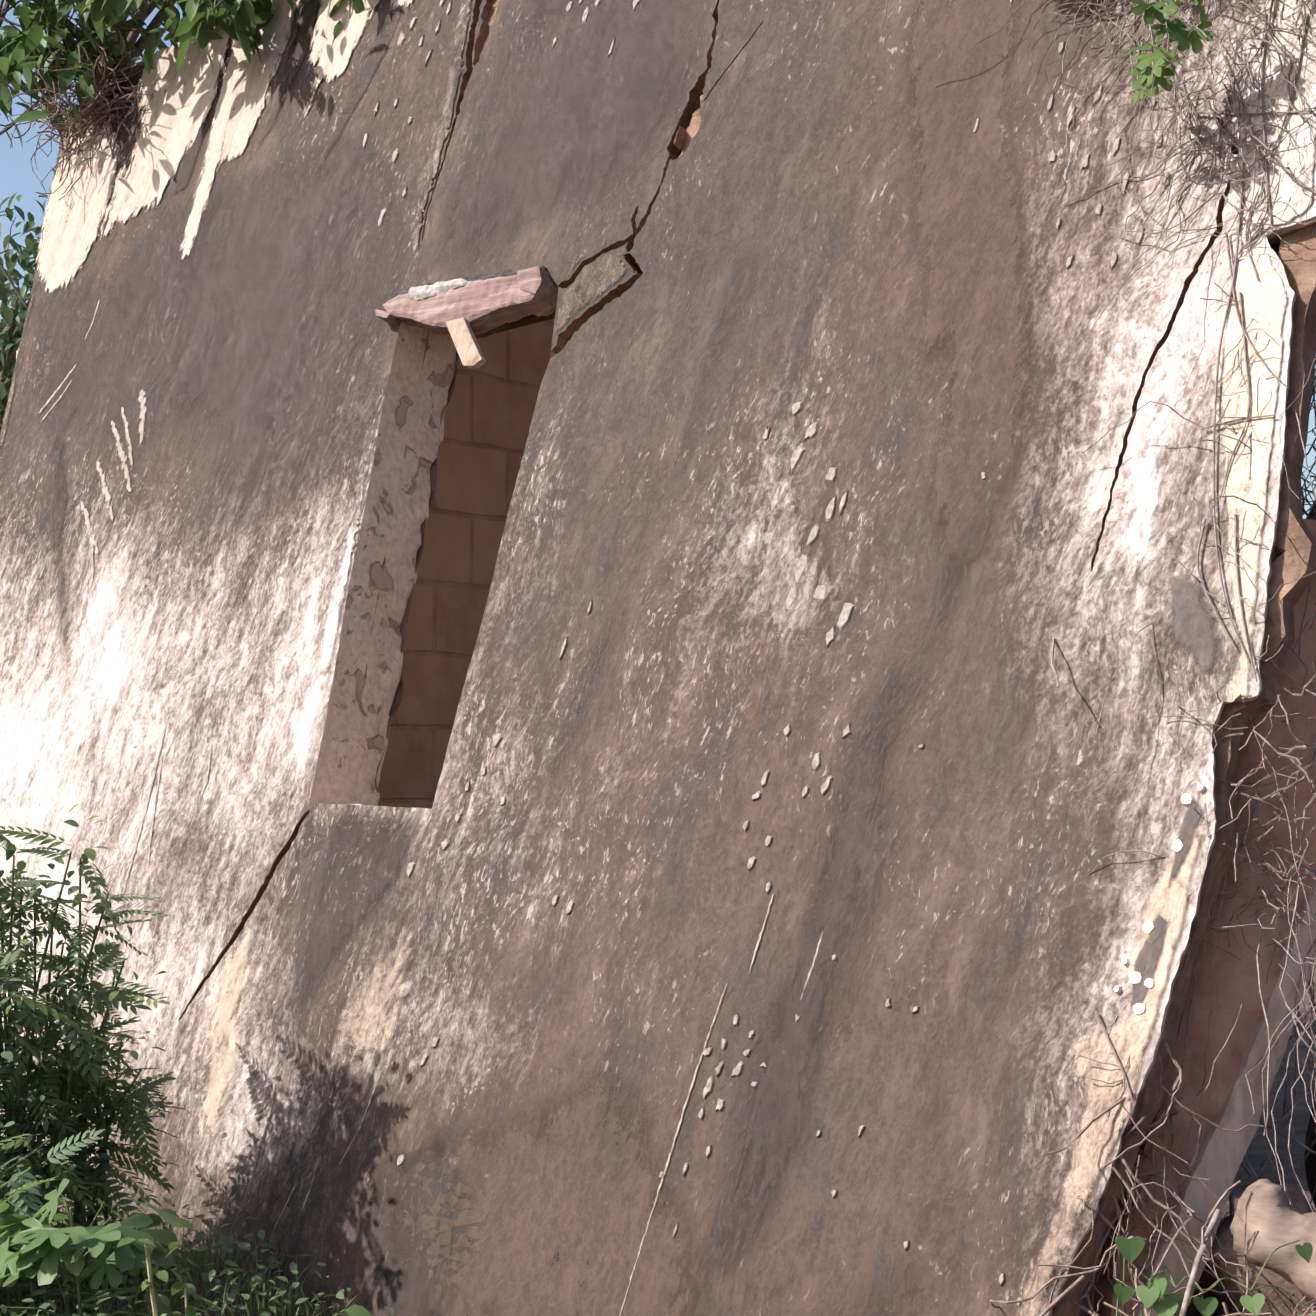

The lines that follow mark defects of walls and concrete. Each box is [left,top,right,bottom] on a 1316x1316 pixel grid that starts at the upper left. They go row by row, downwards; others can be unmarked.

peeling [26,0,301,320]
peeling [304,0,471,249]
crack [422,0,500,239]
crack [551,0,764,354]
spalling [0,371,16,446]
peeling [1124,359,1179,564]
crack [1091,115,1238,571]
peeling [1222,1,1316,703]
peeling [296,509,361,772]
peeling [1170,577,1218,670]
crack [178,809,310,1022]
spalling [1017,800,1201,1316]